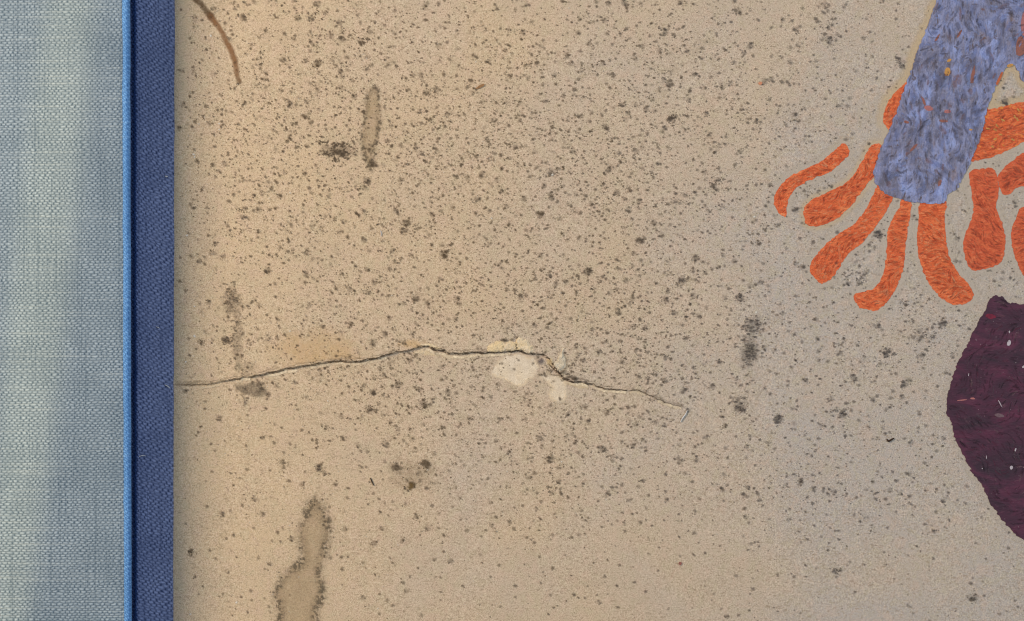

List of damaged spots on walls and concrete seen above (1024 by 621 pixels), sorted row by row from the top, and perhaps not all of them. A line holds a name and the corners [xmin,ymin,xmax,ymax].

water stain [180,0,803,476]
crack [237,337,681,409]
spalling [492,354,567,402]
water stain [730,317,871,512]